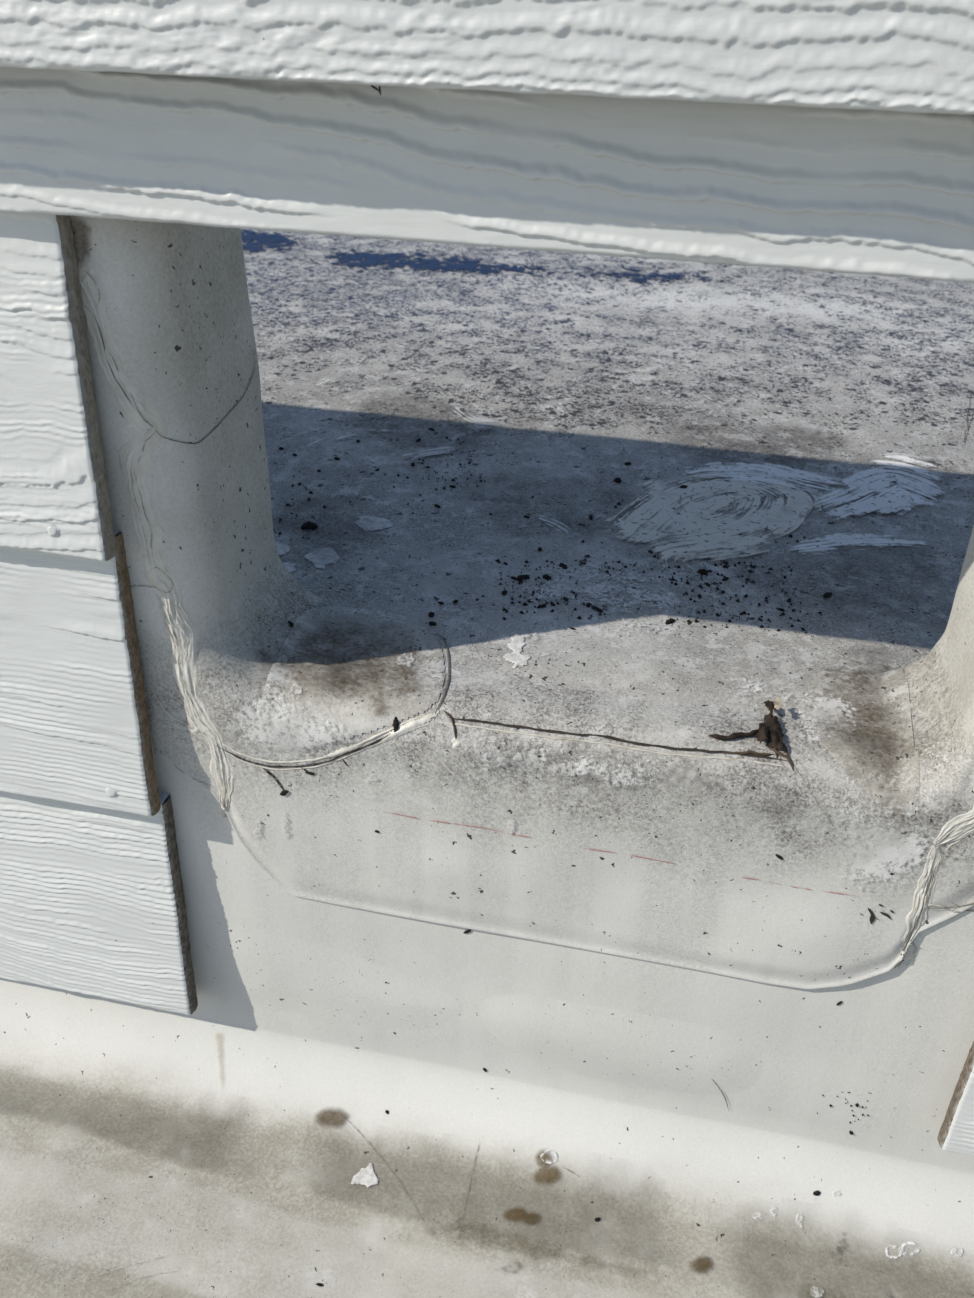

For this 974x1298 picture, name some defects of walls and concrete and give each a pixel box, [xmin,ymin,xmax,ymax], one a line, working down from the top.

water stain [263,624,417,711]
crack [220,633,816,801]